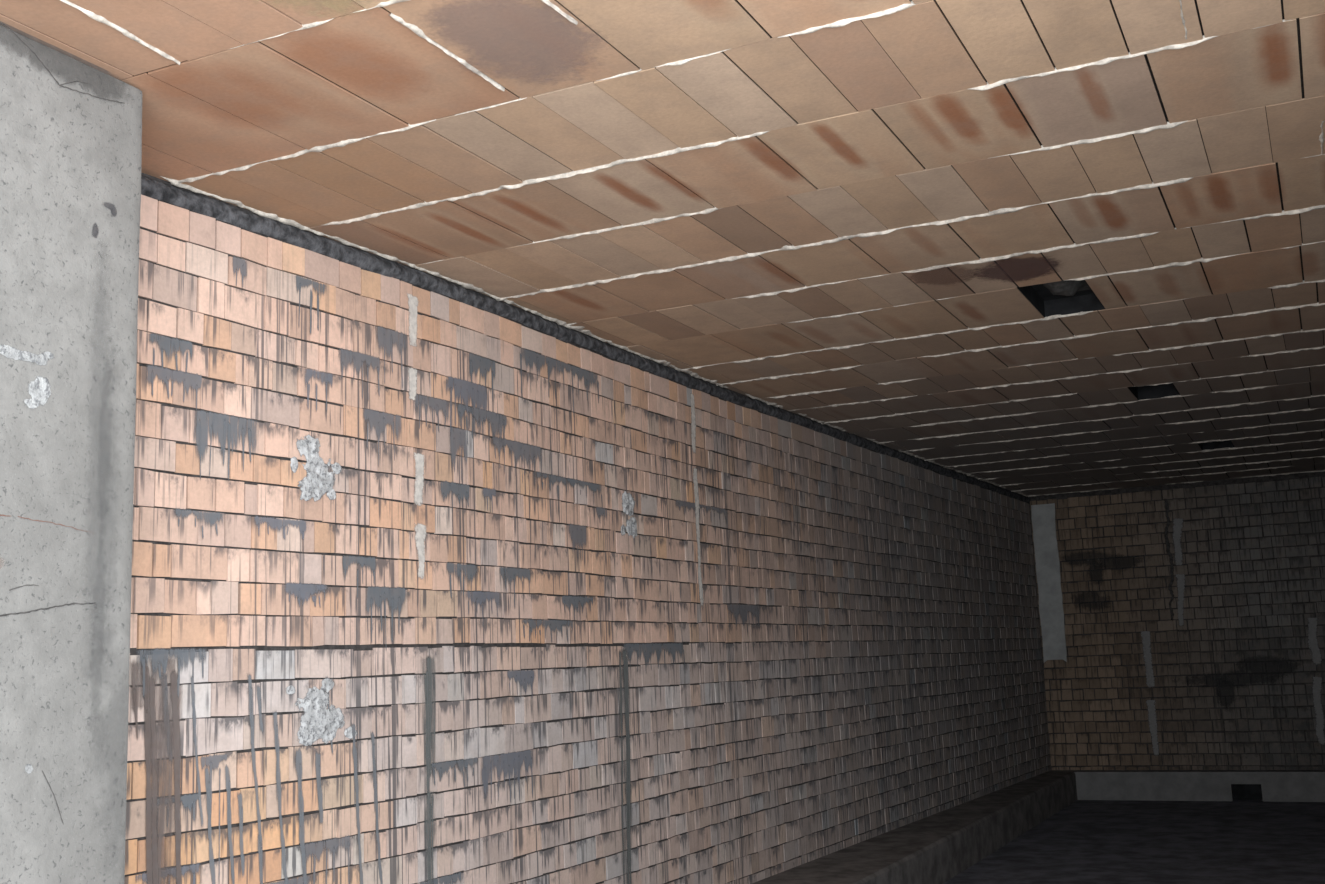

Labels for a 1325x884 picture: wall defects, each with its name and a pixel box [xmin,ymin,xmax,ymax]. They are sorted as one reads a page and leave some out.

damp [408,294,418,346]
damp [408,368,417,400]
spalling [290,435,342,502]
damp [414,452,425,506]
damp [690,394,704,605]
damp [415,523,426,579]
crack [0,585,96,616]
spalling [286,678,357,746]
damp [133,661,159,884]
damp [171,671,182,884]
damp [424,657,434,884]
damp [619,650,631,884]